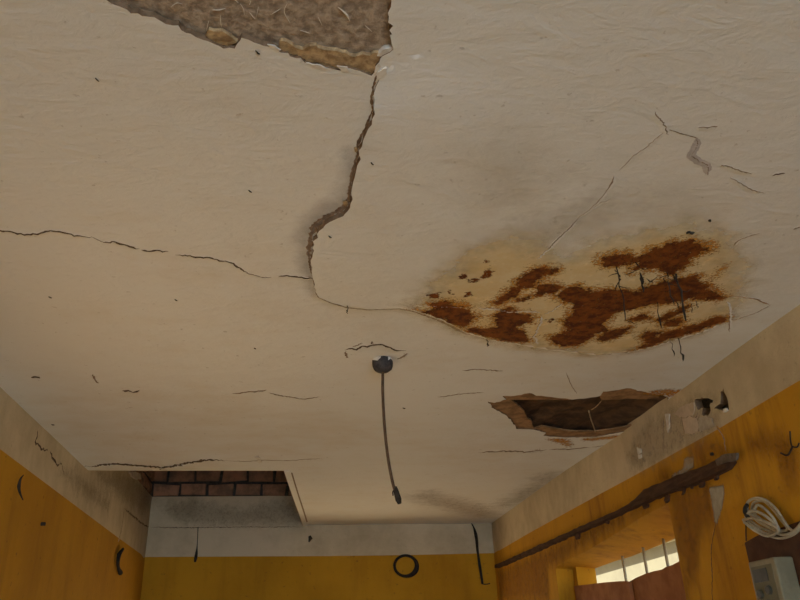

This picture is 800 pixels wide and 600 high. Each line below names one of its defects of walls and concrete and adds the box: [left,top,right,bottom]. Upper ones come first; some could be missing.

spalling [119,0,393,74]
crack [0,67,561,345]
crack [539,112,670,258]
crack [720,163,785,194]
corrosion [406,226,741,355]
crack [341,341,409,360]
crack [233,390,318,400]
spalling [490,388,666,437]
crack [34,430,64,474]
crack [84,456,322,470]